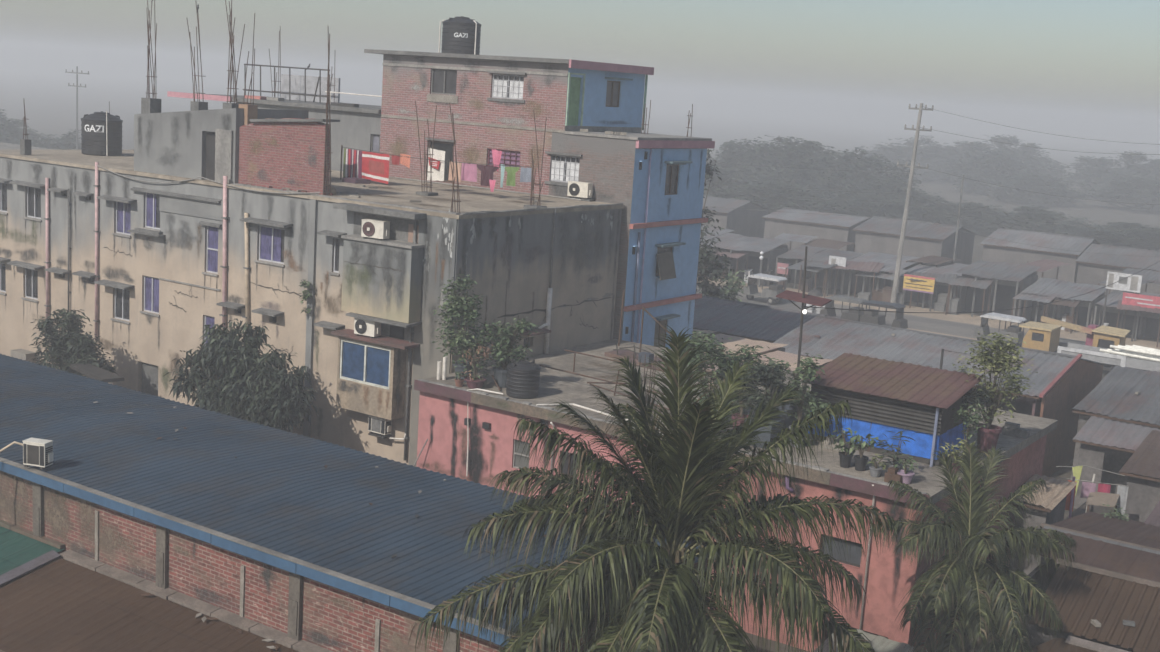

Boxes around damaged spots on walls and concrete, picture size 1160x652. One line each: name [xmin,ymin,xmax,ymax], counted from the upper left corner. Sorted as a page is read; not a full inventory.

leakage [313,243,405,359]
crack [474,297,611,338]
leakage [425,398,497,483]